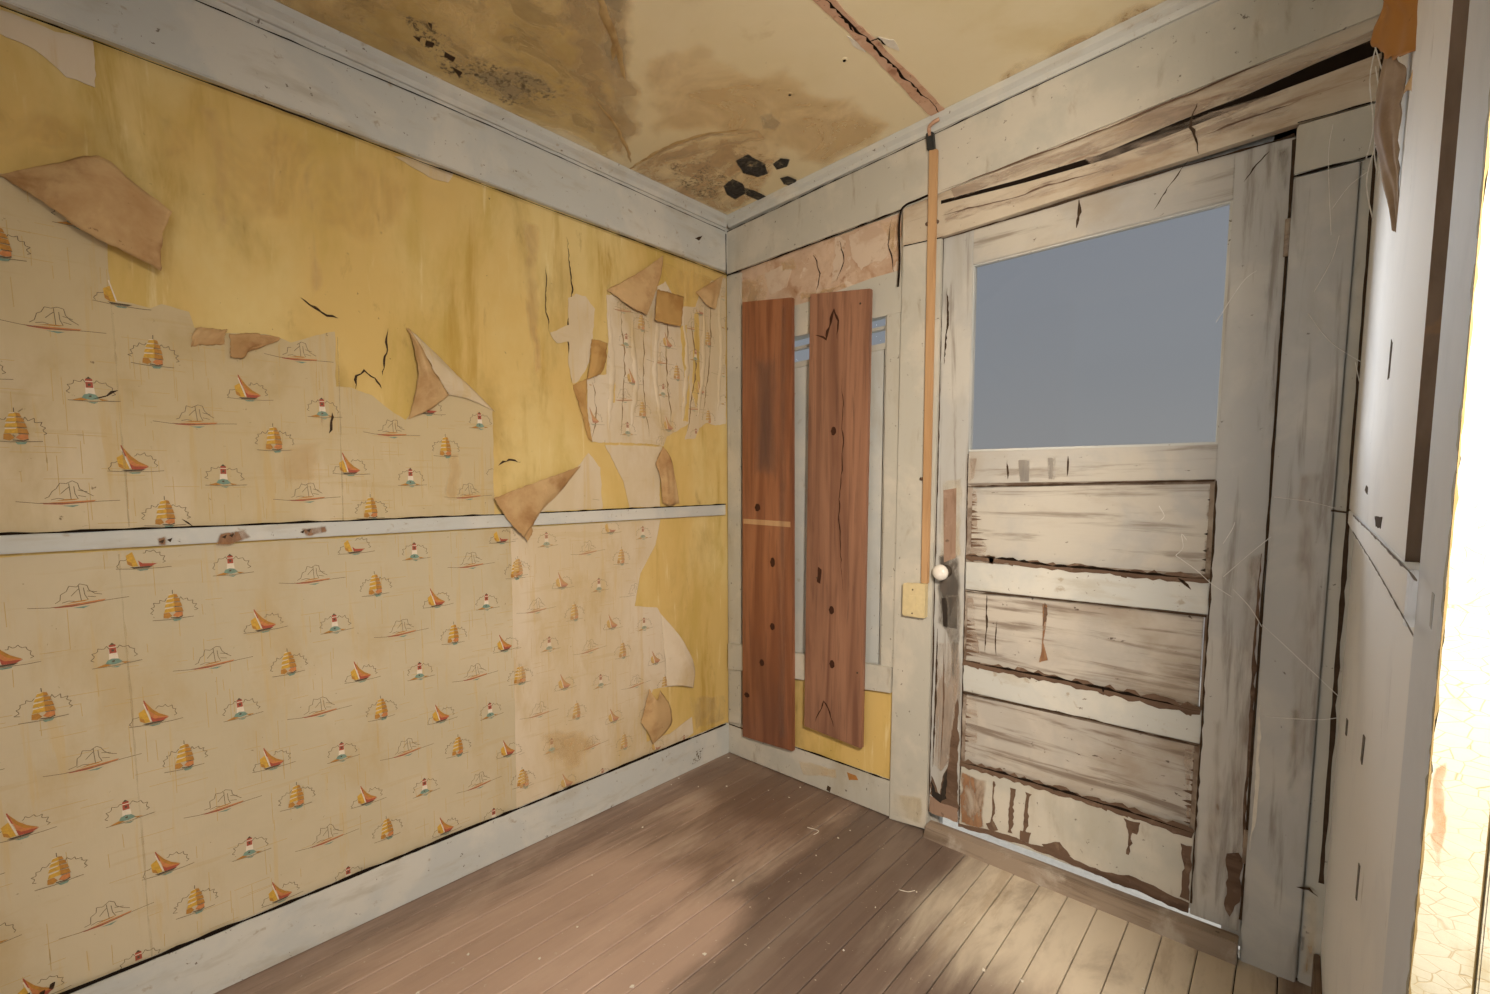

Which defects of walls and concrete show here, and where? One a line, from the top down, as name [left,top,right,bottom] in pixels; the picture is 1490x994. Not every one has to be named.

crack [0,0,1381,363]
water stain [629,121,796,209]
flaking render [655,214,902,327]
peeling [191,327,281,359]
peeling [407,328,494,419]
peeling [573,339,608,441]
peeling [656,447,679,506]
peeling [1408,109,1490,994]
peeling [641,615,695,744]